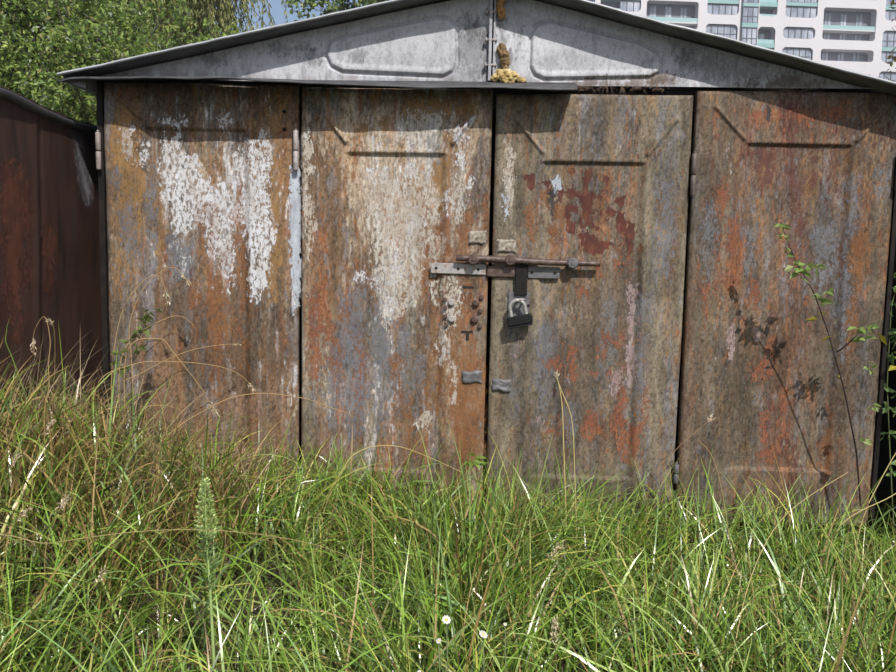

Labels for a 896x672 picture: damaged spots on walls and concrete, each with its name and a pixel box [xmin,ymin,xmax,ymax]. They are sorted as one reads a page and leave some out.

rust [356,95,482,136]
rust [105,99,166,301]
peeling [117,114,278,304]
peeling [353,150,474,331]
rust [396,131,474,330]
rust [522,163,638,300]
rust [699,175,740,329]
rust [747,141,847,292]
rust [304,283,369,406]
rust [388,294,488,474]
rust [749,335,775,385]